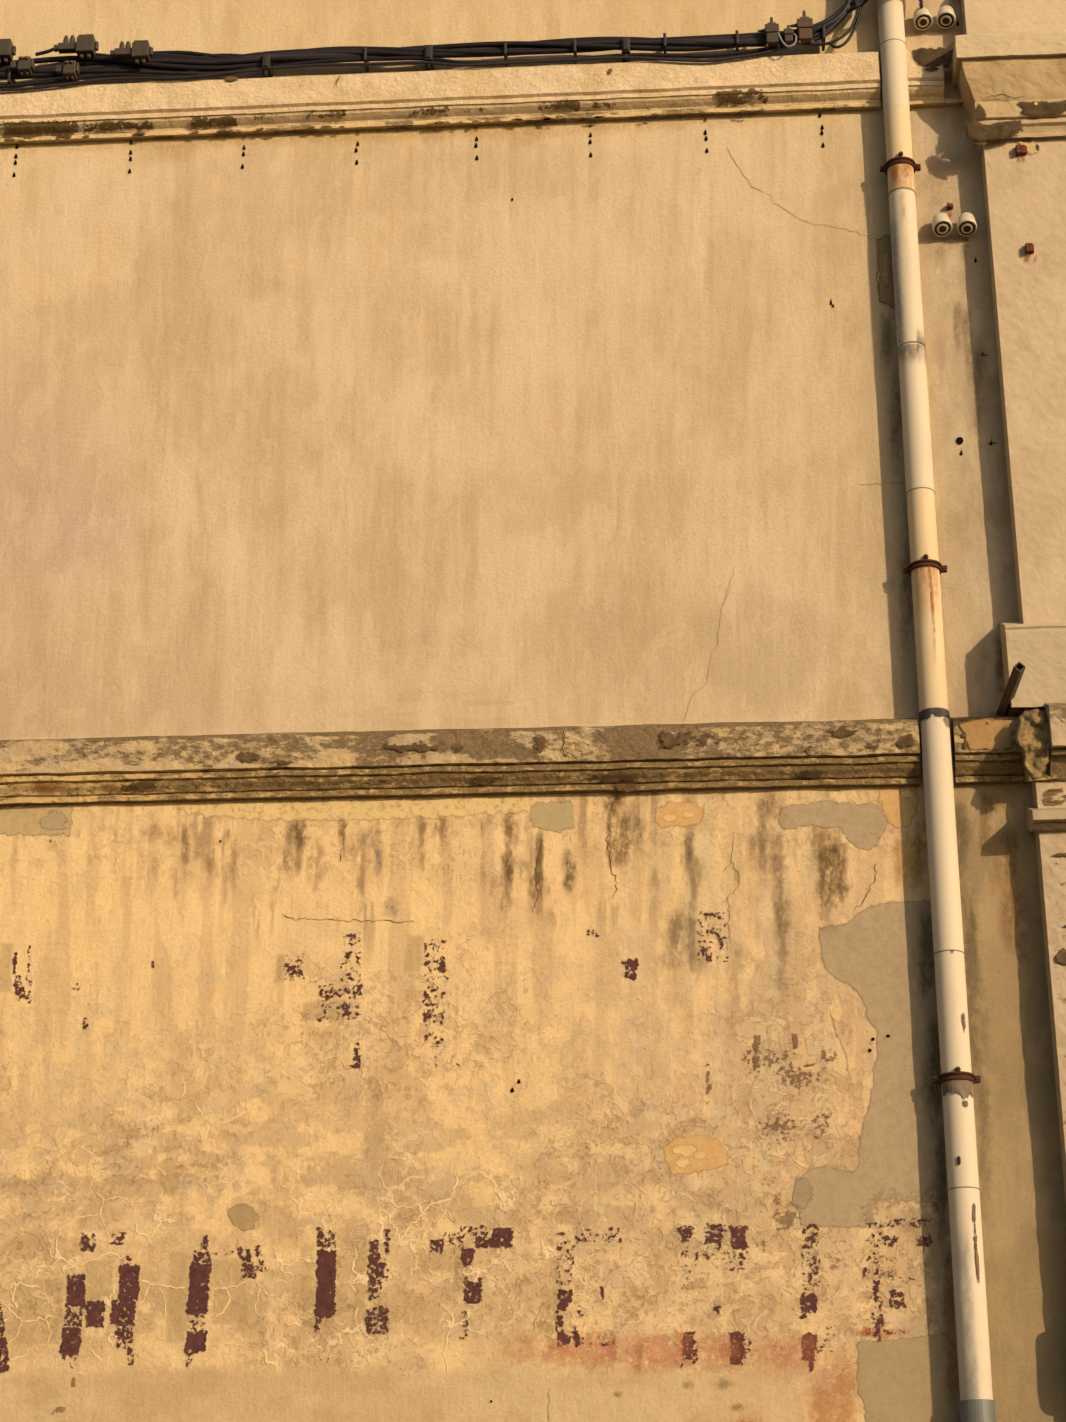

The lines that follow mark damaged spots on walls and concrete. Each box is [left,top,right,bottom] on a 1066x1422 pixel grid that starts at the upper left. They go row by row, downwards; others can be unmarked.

flaking render [964,100,1066,154]
crack [727,147,891,307]
crack [685,567,735,719]
crack [0,1300,61,1365]
crack [62,1181,291,1352]
crack [394,1145,543,1248]